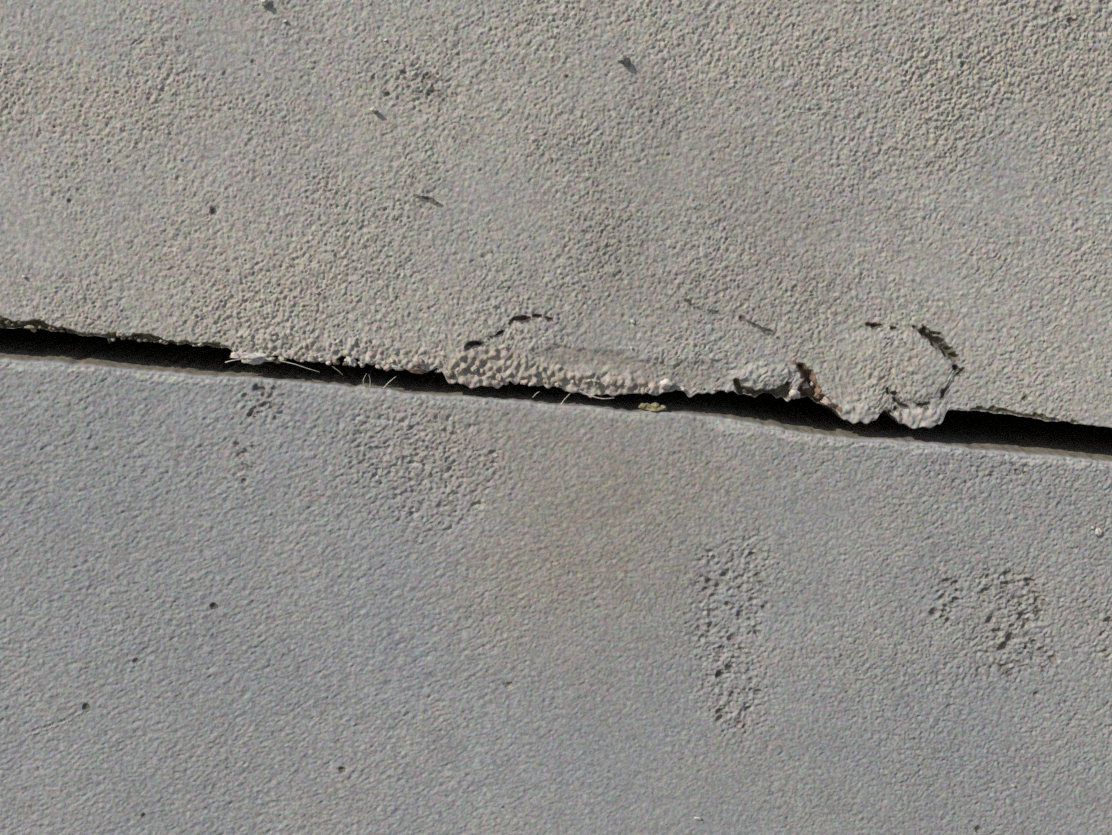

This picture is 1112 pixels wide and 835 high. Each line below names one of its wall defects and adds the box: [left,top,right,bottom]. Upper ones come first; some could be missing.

crack [464,314,553,349]
peeling [230,330,955,436]
crack [865,322,965,414]